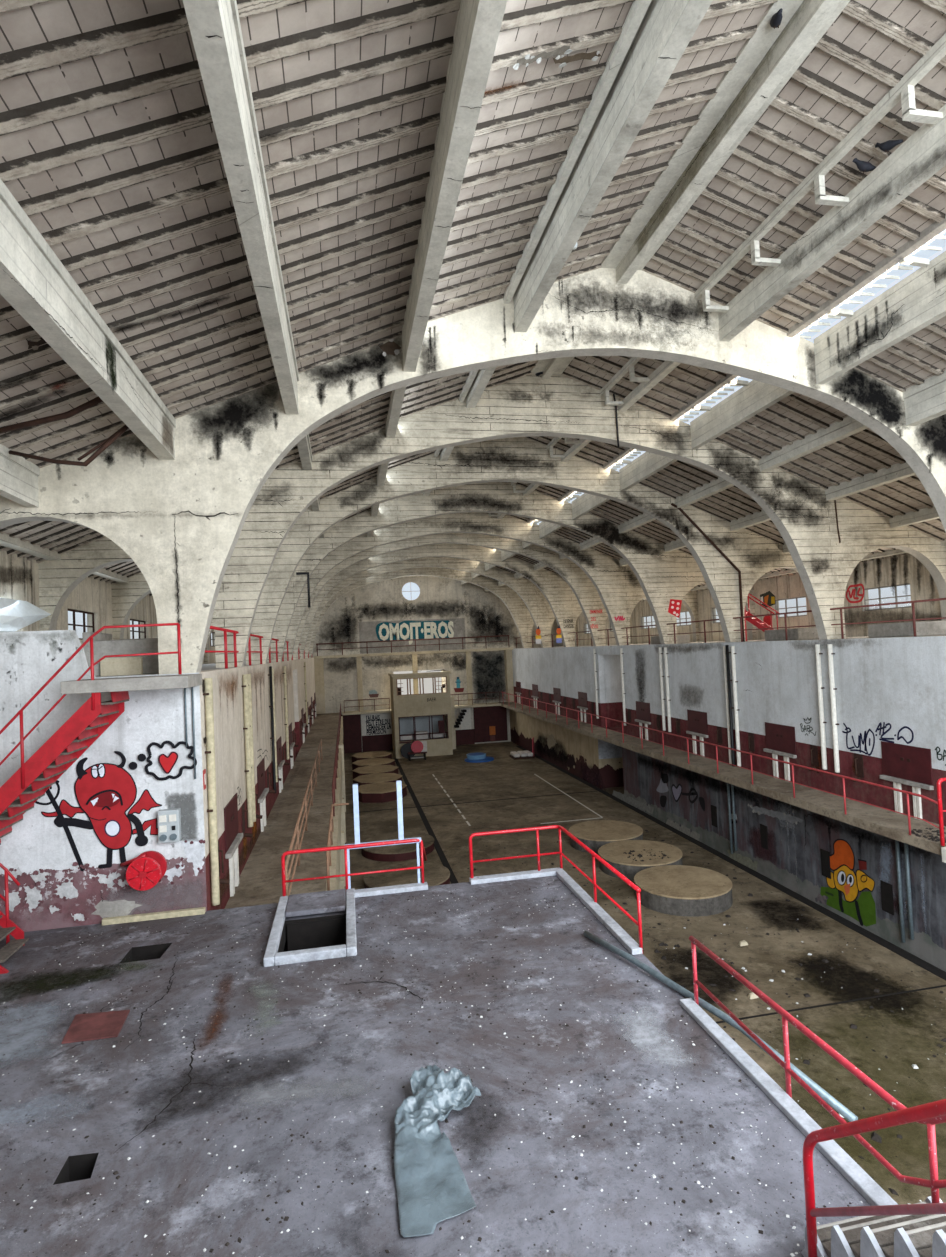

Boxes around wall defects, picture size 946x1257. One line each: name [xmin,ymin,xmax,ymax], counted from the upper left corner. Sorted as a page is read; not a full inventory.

leakage [559,280,708,343]
leakage [808,350,816,388]
leakage [827,301,946,472]
mould [193,385,277,460]
peeling [3,862,129,925]
peeling [164,839,205,885]
crack [100,952,178,1050]
rust [200,982,231,1046]
leakage [660,949,742,1004]
leakage [796,957,919,1011]
crack [113,1033,223,1154]